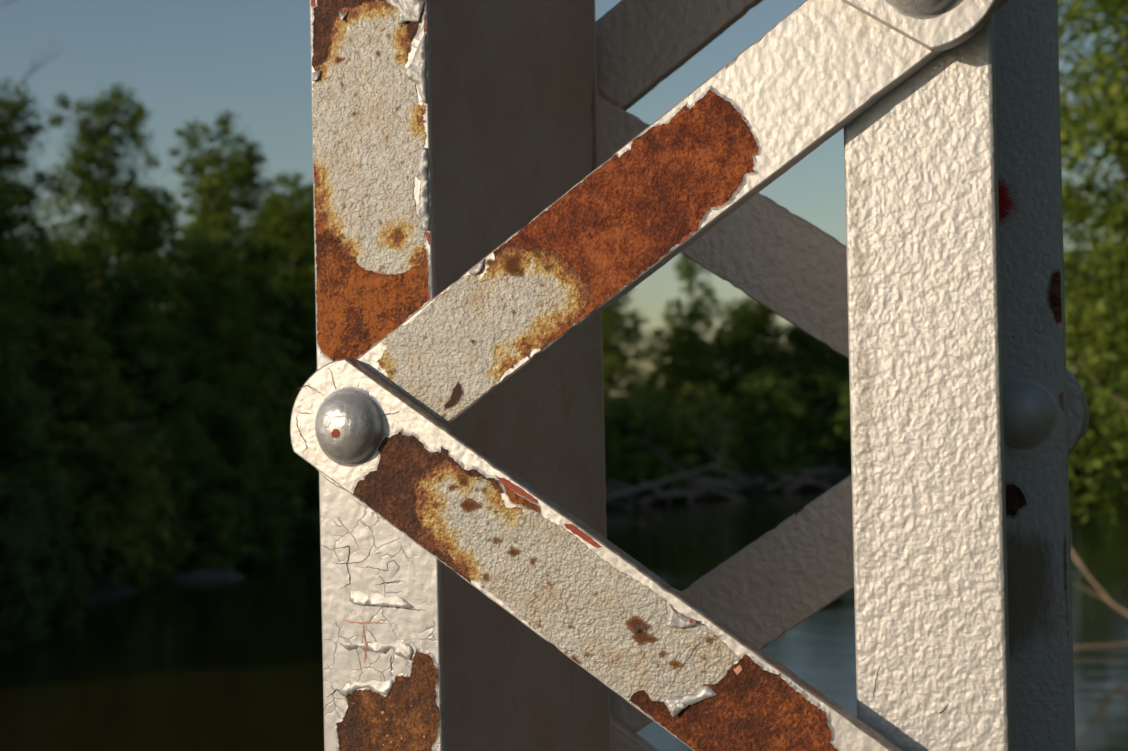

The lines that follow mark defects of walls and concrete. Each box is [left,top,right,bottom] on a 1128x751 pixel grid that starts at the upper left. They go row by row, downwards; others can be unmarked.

rust [311,0,425,68]
rust [313,147,431,362]
rust [493,85,761,379]
rust [351,427,506,584]
crack [332,546,425,671]
rust [334,646,440,751]
rust [627,652,841,751]